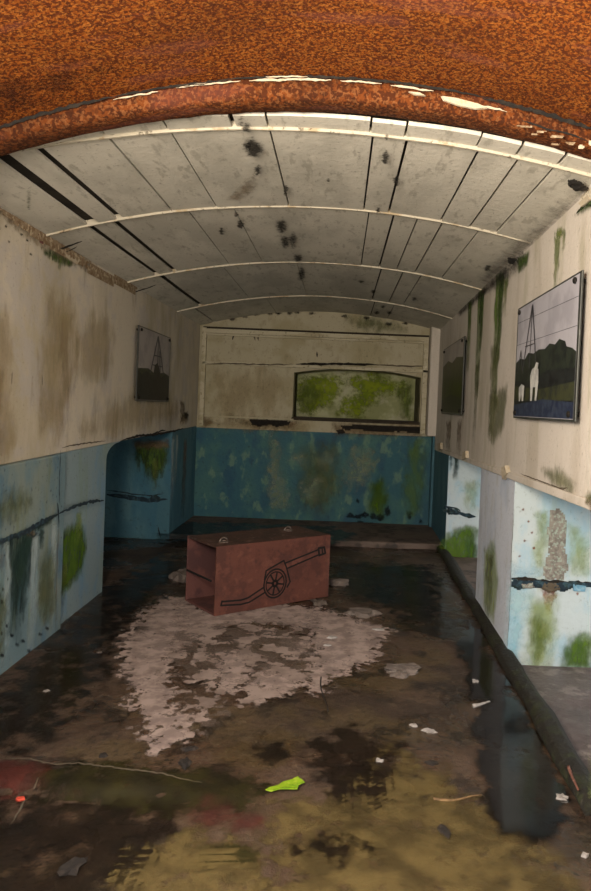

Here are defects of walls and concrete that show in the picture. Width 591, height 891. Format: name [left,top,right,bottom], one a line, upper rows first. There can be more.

peeling [179,75,506,112]
peeling [517,125,591,149]
leakage [554,233,565,279]
leakage [459,226,547,392]
peeling [543,508,569,580]
leakage [0,522,357,756]
leakage [252,742,290,764]
leakage [307,724,406,814]
leakage [292,834,374,868]